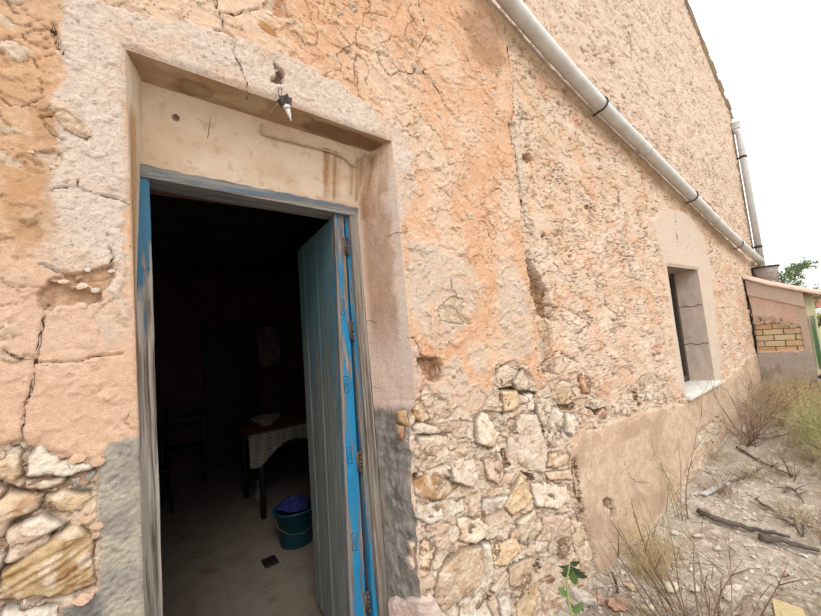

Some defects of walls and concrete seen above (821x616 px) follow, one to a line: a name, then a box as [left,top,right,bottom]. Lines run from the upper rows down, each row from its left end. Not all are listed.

crack [214,0,257,100]
spalling [39,266,116,314]
crack [7,305,122,438]
spalling [0,440,106,616]
spalling [388,354,682,616]